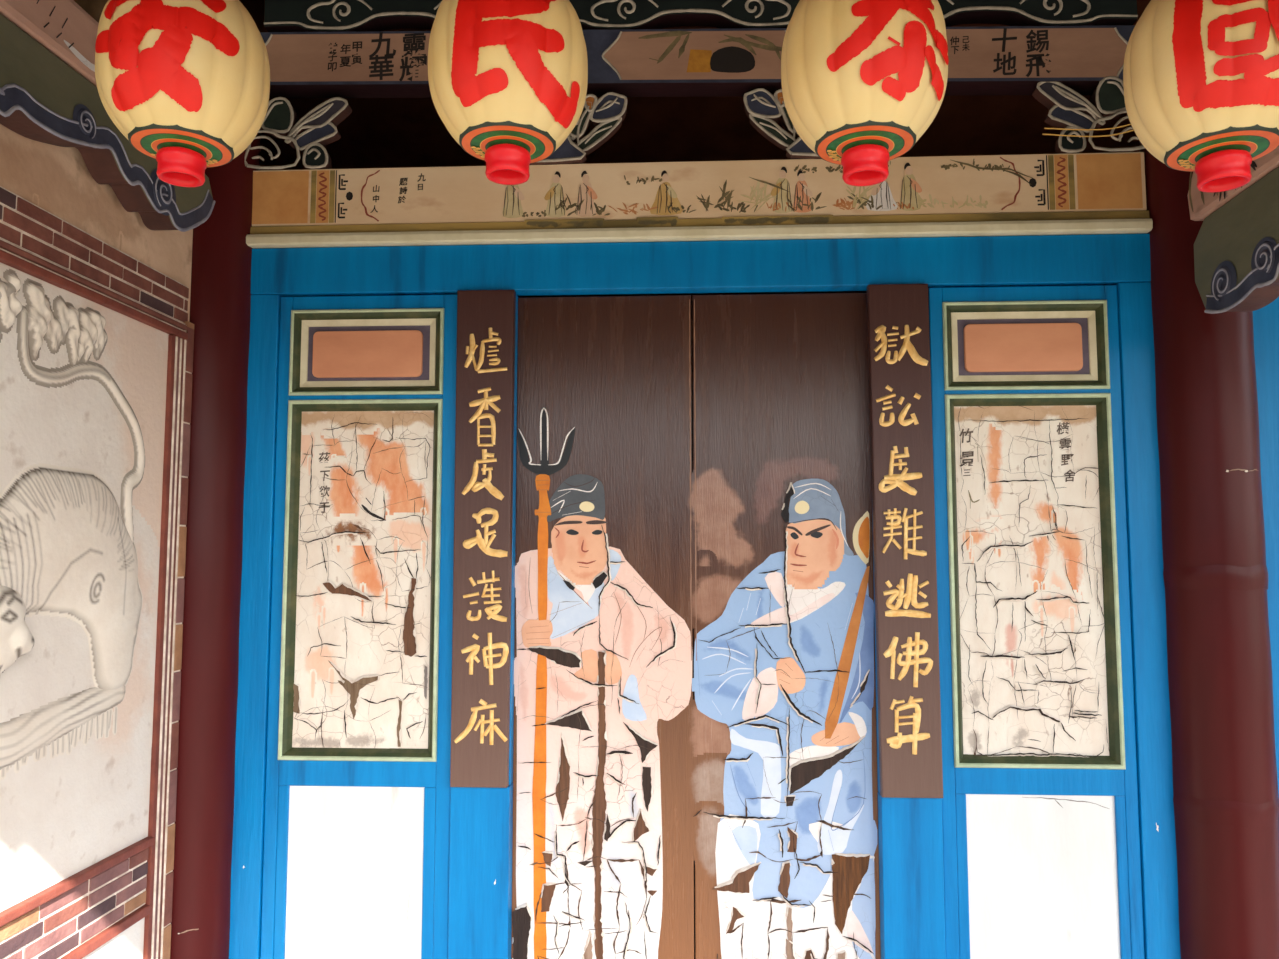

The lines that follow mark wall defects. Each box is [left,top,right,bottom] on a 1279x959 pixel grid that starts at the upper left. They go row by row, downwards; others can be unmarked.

peeling [295,542,428,747]
crack [295,412,431,749]
crack [958,405,1110,757]